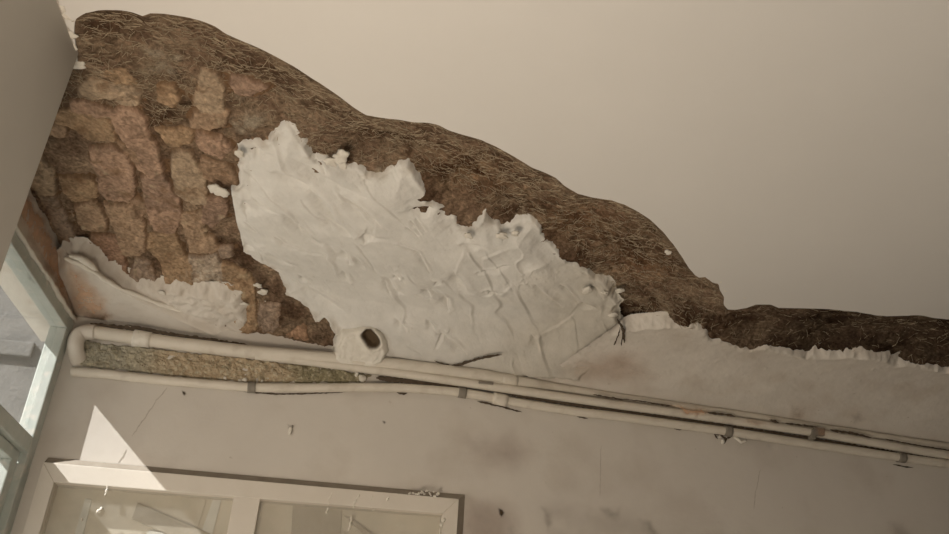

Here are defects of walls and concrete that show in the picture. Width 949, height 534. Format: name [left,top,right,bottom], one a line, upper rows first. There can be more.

peeling [59,5,79,51]
flaking render [31,66,309,341]